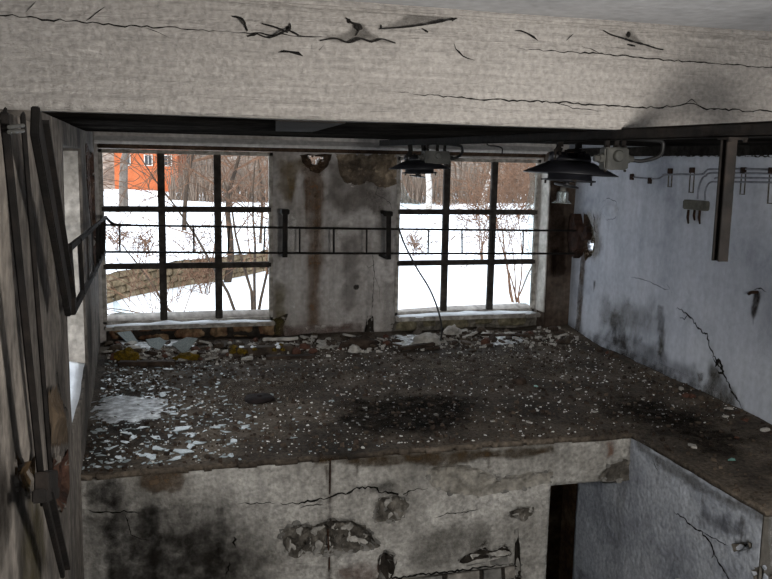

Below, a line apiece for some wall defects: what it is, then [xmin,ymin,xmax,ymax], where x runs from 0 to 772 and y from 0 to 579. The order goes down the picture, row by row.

crack [0,3,315,37]
crack [519,46,772,68]
crack [400,92,772,112]
spalling [300,154,332,173]
crack [677,307,742,408]
water stain [698,366,735,406]
crack [240,486,428,508]
water stain [111,509,235,579]
spalling [277,493,409,579]
crack [388,528,523,579]
flaking render [403,543,522,579]
crack [674,512,729,579]